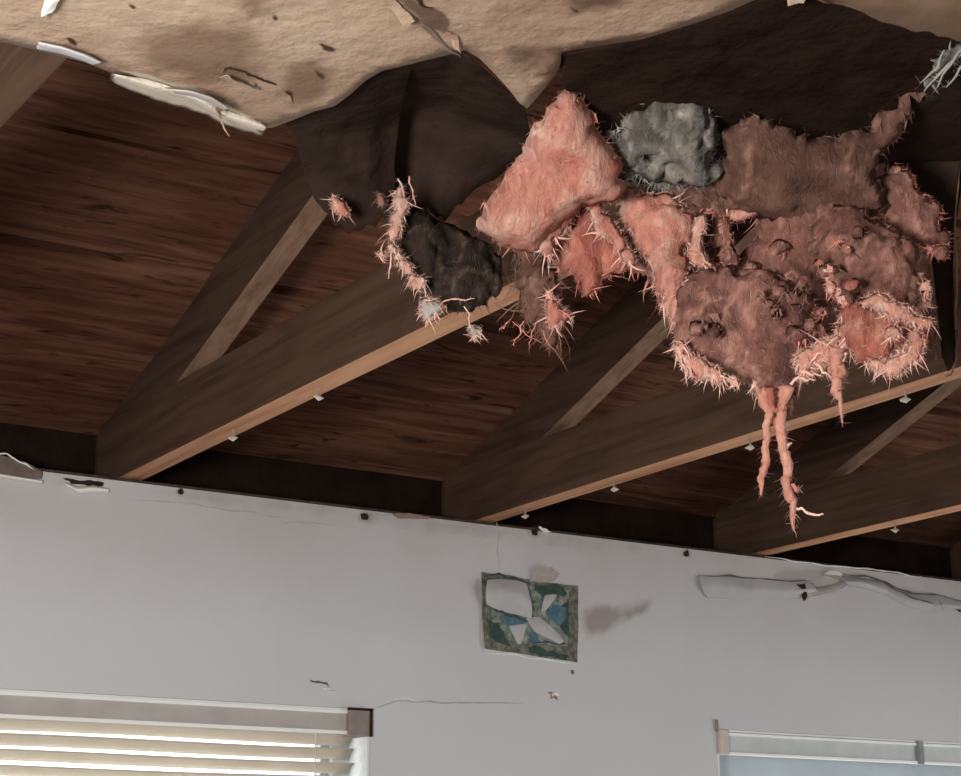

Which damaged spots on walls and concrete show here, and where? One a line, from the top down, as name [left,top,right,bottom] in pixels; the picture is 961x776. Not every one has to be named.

peeling [387,0,415,26]
peeling [0,453,43,484]
flaking render [63,478,109,493]